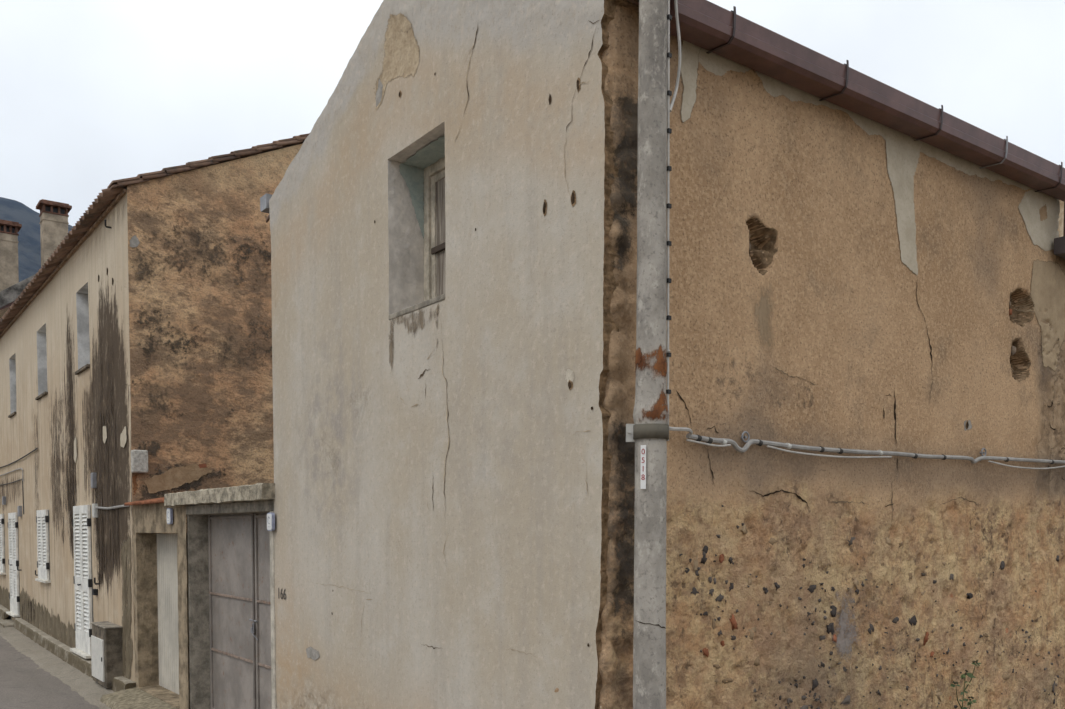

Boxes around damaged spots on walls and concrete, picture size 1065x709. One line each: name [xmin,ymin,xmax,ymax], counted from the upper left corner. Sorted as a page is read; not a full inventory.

spalling [373,12,420,110]
crack [454,28,478,143]
damp [610,97,638,270]
peeling [681,40,1065,382]
damp [132,215,272,368]
crack [400,333,450,509]
corrosion [635,345,667,377]
corrosion [642,390,668,420]
damp [51,334,133,679]